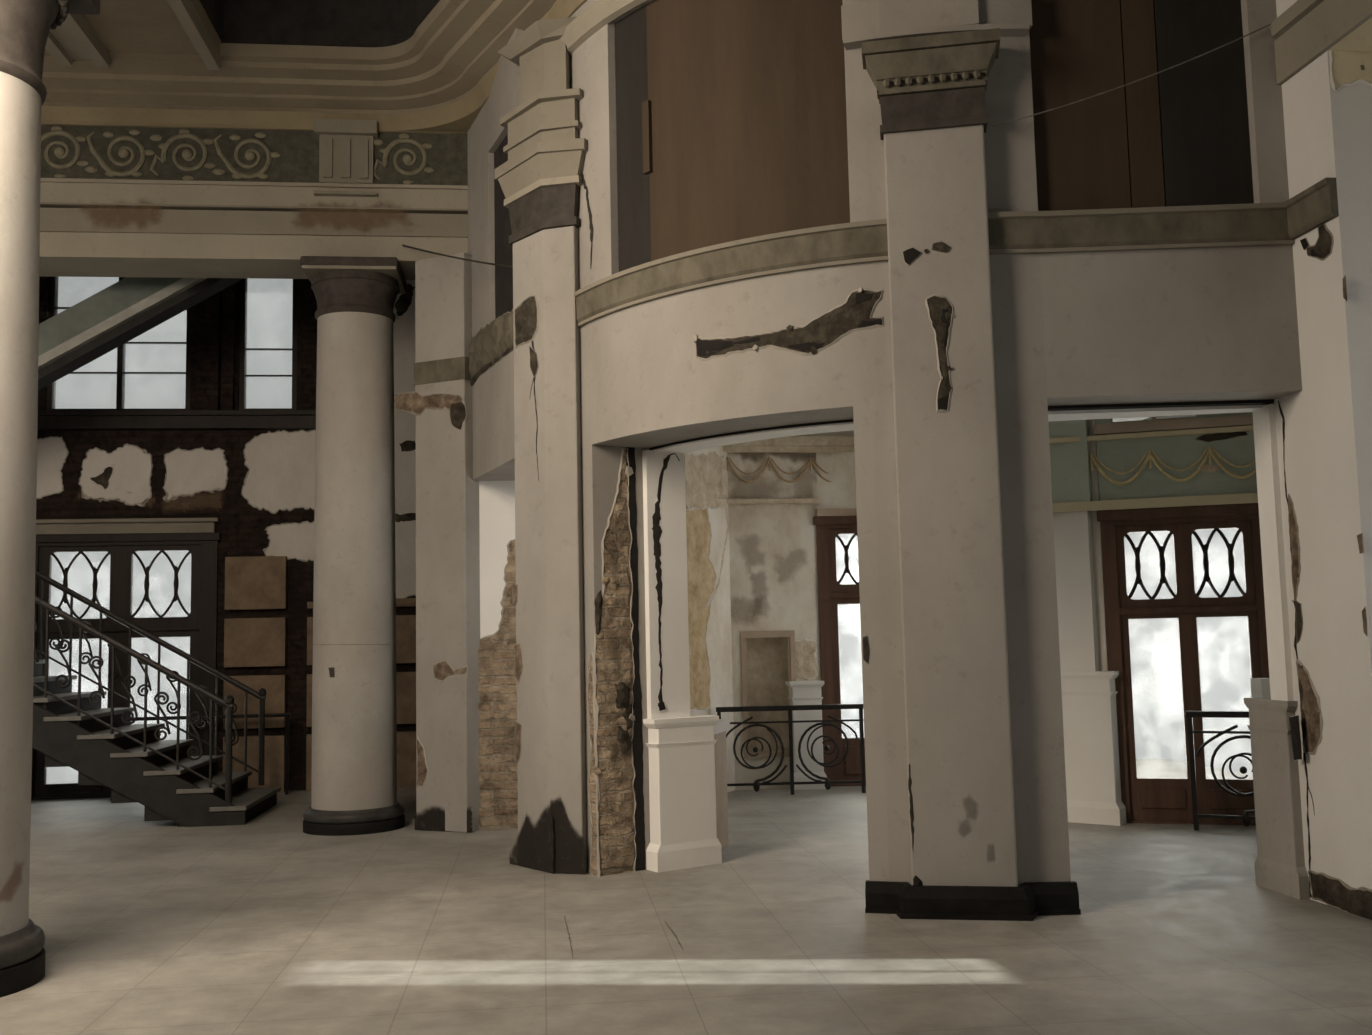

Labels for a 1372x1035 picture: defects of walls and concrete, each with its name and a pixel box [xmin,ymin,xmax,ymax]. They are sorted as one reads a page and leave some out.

flaking render [903,241,951,266]
flaking render [1300,224,1334,261]
flaking render [690,287,884,361]
flaking render [925,294,954,413]
flaking render [36,429,316,562]
flaking render [433,539,524,830]
flaking render [587,448,636,877]